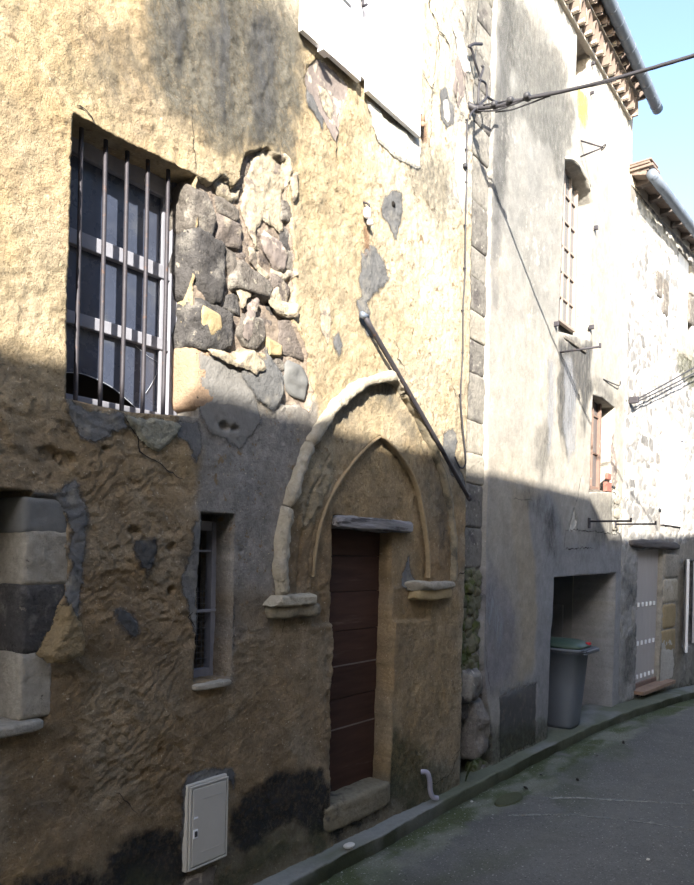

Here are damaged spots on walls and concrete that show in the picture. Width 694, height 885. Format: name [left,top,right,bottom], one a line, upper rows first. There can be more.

leakage [145,0,302,158]
spalling [305,59,348,141]
spalling [126,149,314,452]
leakage [548,341,592,453]
leakage [21,829,185,885]
leakage [230,768,379,853]